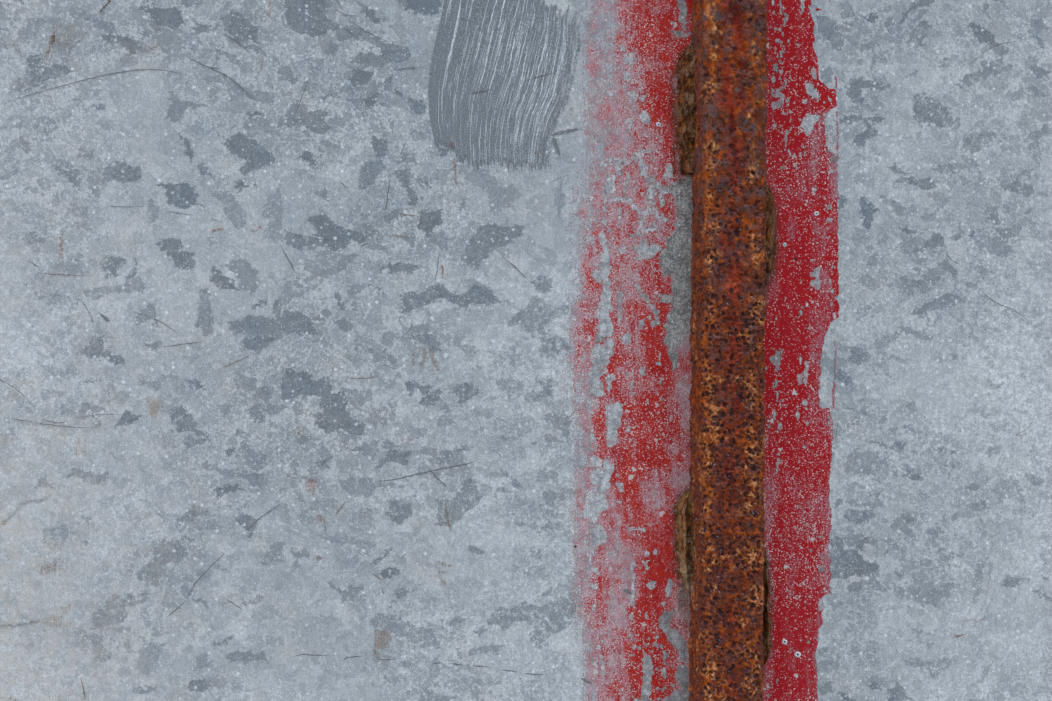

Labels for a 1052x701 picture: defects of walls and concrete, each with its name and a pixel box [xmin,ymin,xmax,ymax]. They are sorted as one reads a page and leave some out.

peeling [670,0,693,38]
peeling [606,45,651,129]
peeling [771,0,832,170]
peeling [824,132,839,174]
peeling [810,259,837,320]
peeling [579,148,693,590]
peeling [765,349,784,441]
peeling [797,356,810,386]
peeling [628,548,690,701]